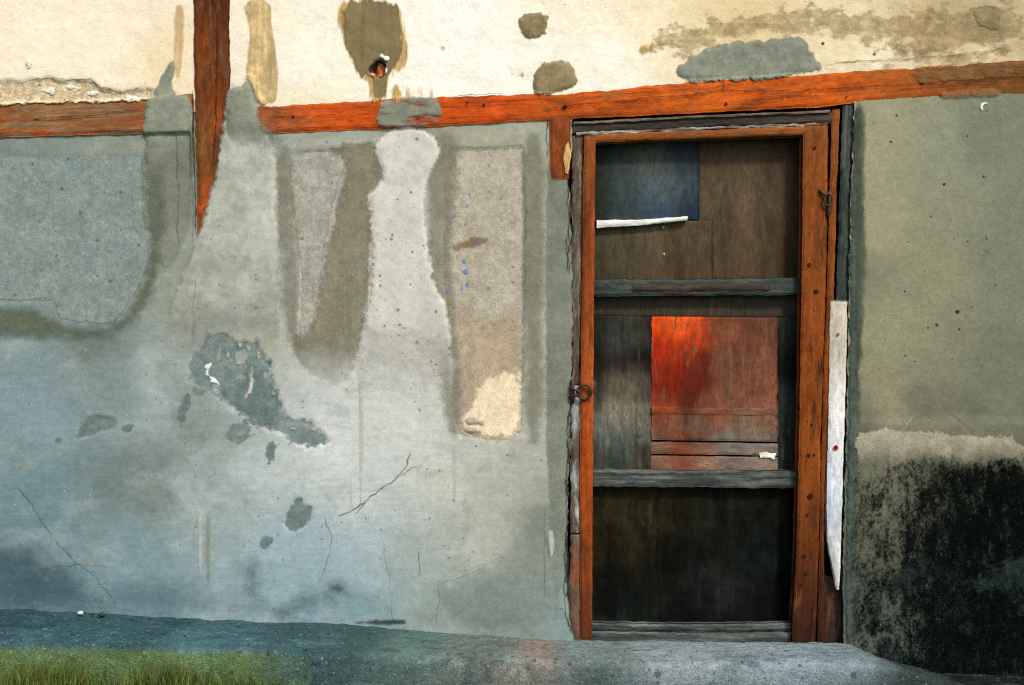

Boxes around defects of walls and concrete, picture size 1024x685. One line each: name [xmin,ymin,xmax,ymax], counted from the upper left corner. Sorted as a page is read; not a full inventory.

spalling [0,79,155,105]
damp [719,2,1020,61]
damp [116,161,163,329]
damp [277,142,383,359]
damp [0,309,86,338]
spalling [178,333,329,464]
spalling [286,498,312,531]
crack [320,452,412,580]
damp [852,427,1024,676]